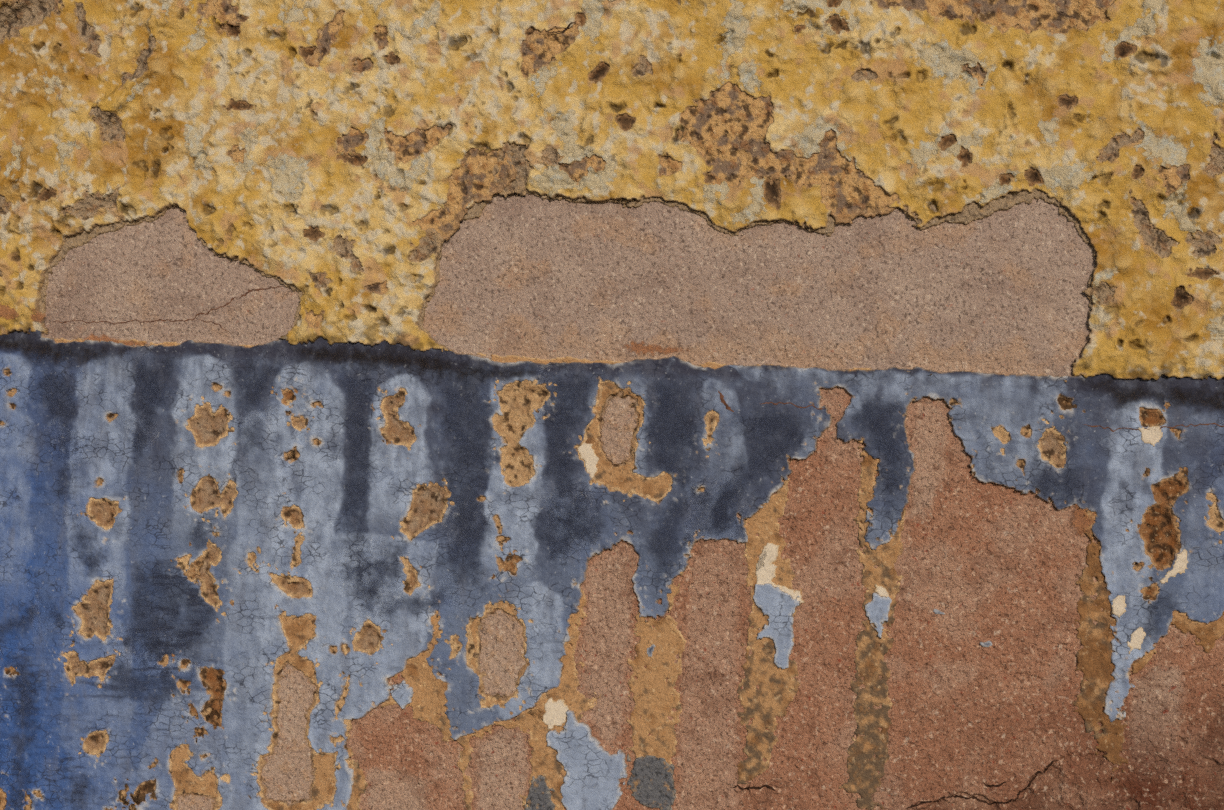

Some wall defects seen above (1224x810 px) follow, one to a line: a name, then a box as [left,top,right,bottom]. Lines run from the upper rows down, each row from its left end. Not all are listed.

peeling [336,117,452,192]
spalling [409,0,1224,376]
spalling [38,141,332,347]
peeling [186,383,236,448]
peeling [58,579,122,688]
leakage [133,569,212,660]
peeling [170,469,238,620]
leakage [357,555,398,595]
spalling [238,379,1224,810]
peeling [105,654,230,810]
crack [732,783,775,791]
crack [906,760,1058,809]